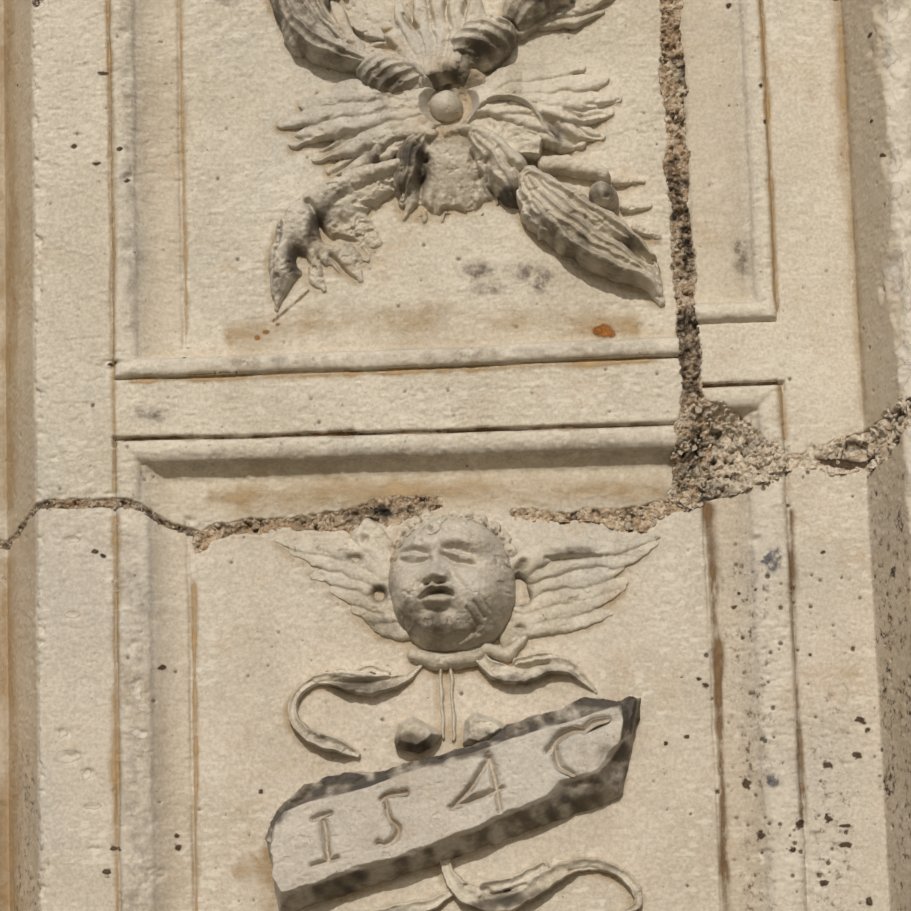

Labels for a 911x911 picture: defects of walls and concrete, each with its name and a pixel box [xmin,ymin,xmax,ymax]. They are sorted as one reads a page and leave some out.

crack [273,290,309,322]
corrosion [593,324,615,337]
crack [659,0,713,509]
spalling [882,250,911,311]
spalling [510,340,911,533]
crack [0,496,199,550]